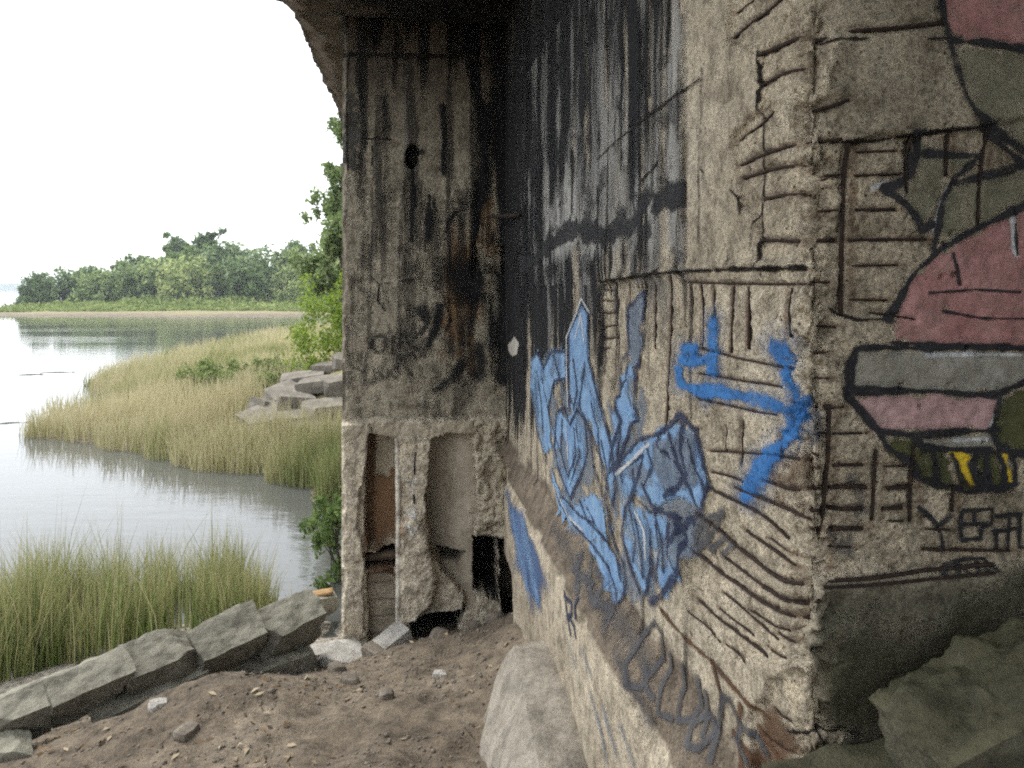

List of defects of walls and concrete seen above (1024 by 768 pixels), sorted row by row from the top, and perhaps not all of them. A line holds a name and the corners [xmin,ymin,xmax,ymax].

water stain [353,64,385,258]
water stain [399,58,506,392]
water stain [470,0,680,418]
spalling [367,572,396,641]
spalling [344,414,507,616]